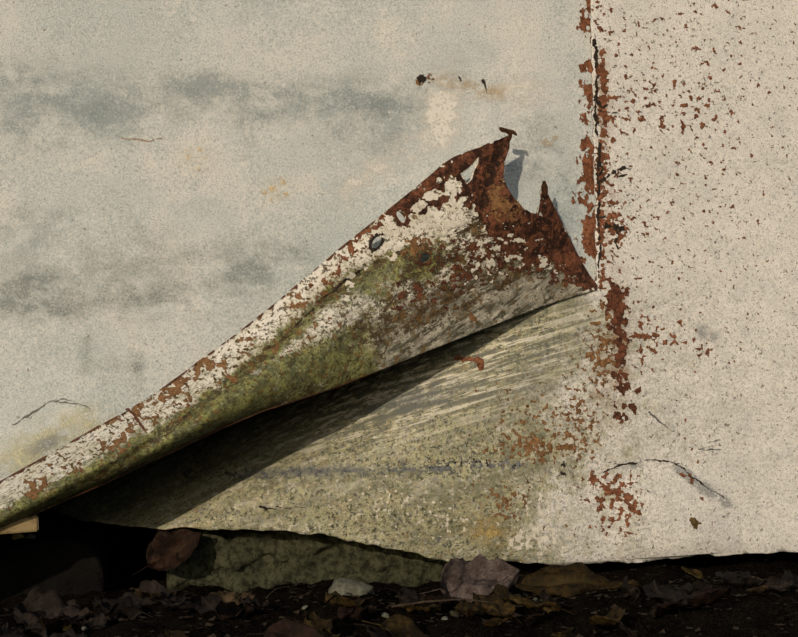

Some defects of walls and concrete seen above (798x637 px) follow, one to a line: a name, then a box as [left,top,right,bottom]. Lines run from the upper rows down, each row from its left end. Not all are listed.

rust [0,0,741,545]
peeling [334,218,420,292]
peeling [440,218,470,250]
peeling [464,223,566,285]
crack [12,398,90,425]
spalling [27,508,122,533]
peeling [182,457,522,548]
peeling [496,481,575,563]
crack [603,459,725,499]